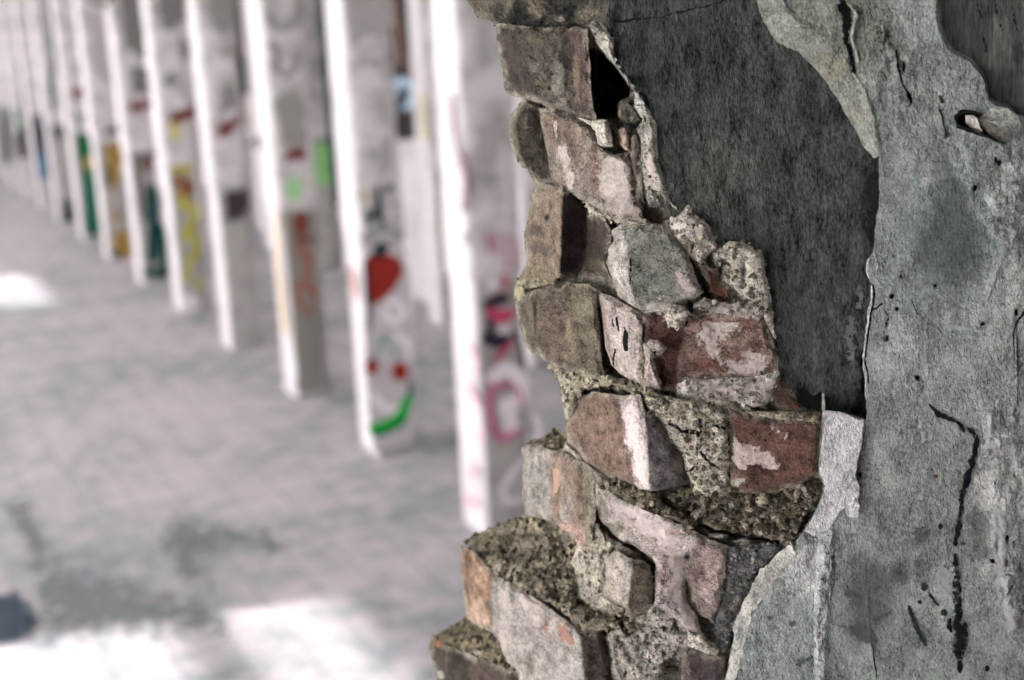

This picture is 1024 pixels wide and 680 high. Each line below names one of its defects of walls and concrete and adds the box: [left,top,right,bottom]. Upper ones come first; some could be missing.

crack [837,0,861,84]
flaking render [936,0,1024,145]
spalling [429,0,881,680]
crack [929,404,976,439]